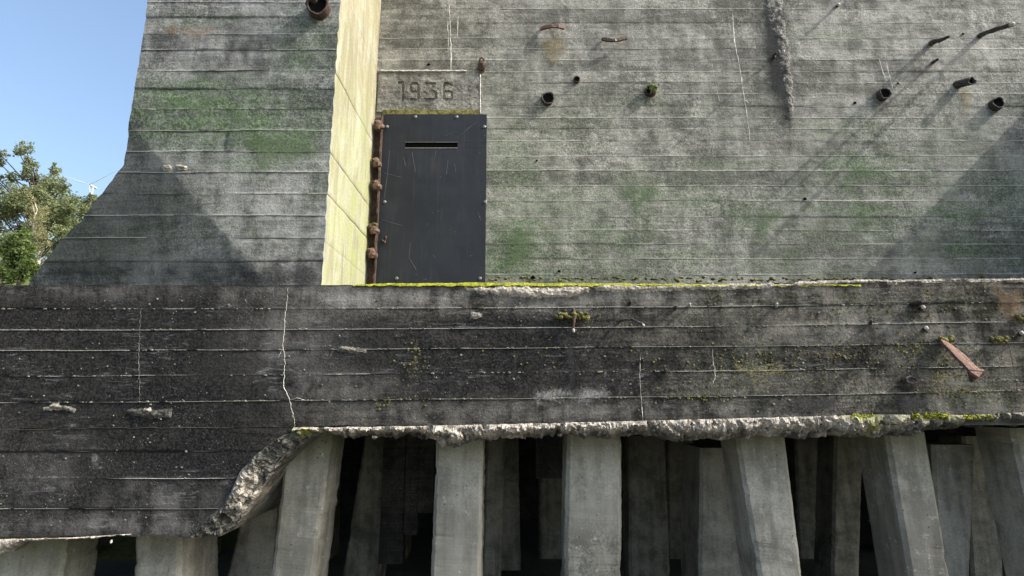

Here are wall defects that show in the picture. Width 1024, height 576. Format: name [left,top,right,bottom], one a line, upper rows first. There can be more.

crack [711,10,750,143]
damp [763,10,791,134]
spalling [191,412,1024,538]